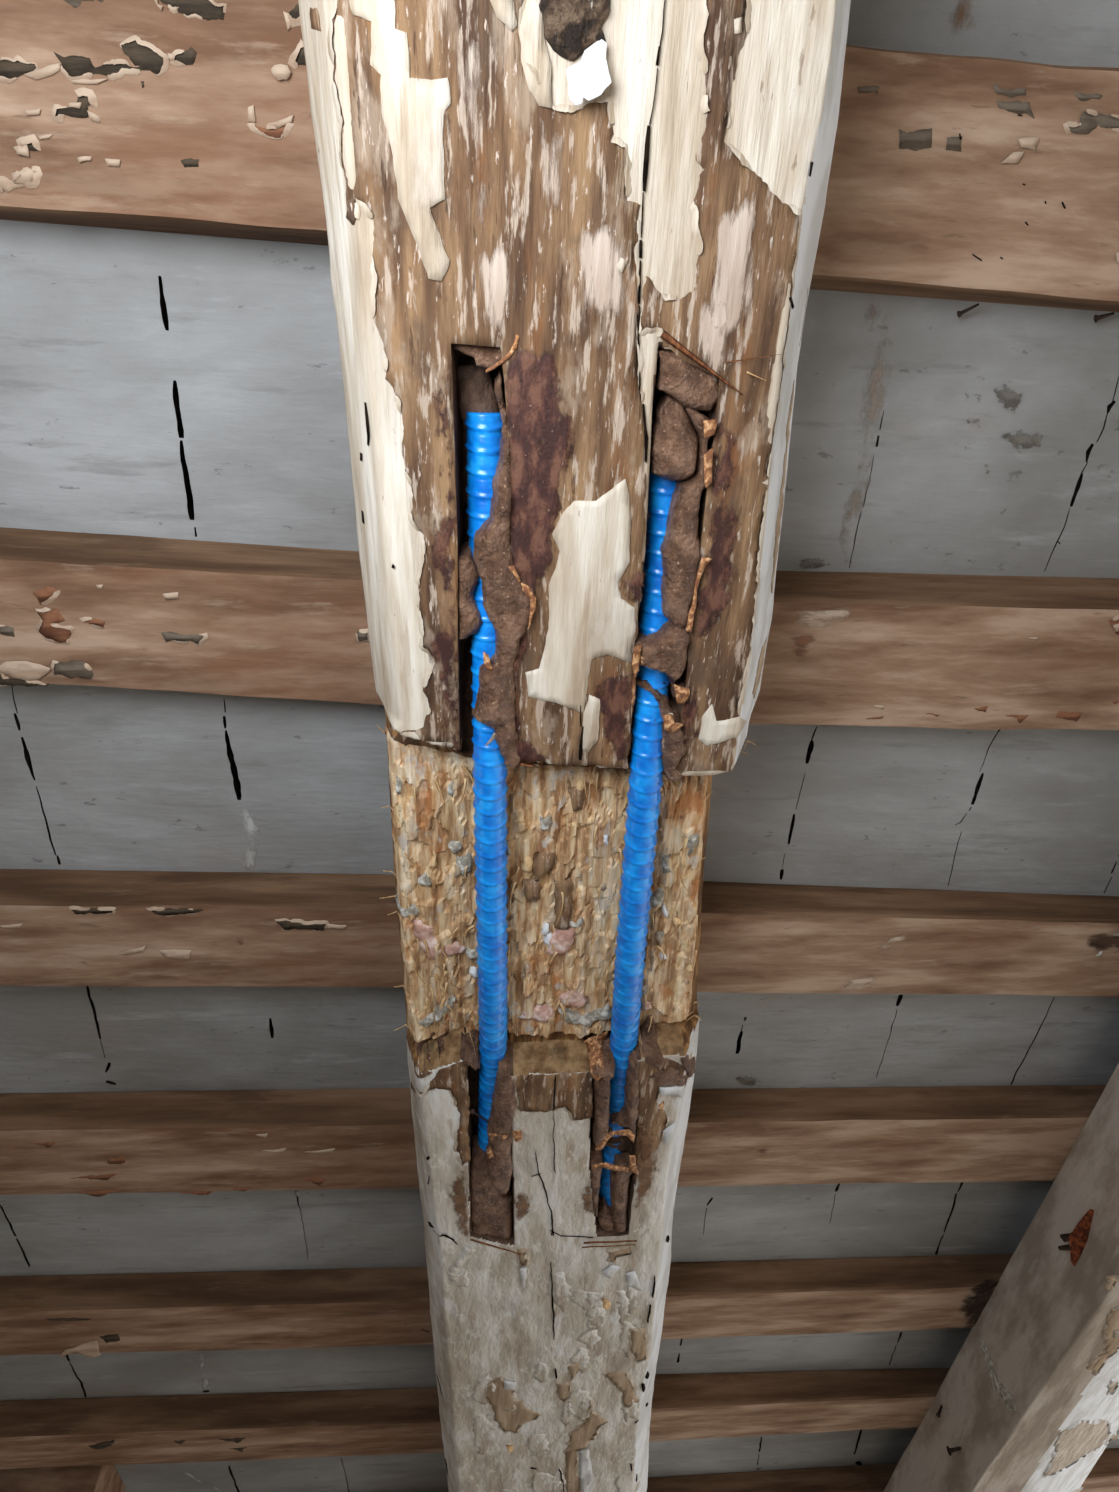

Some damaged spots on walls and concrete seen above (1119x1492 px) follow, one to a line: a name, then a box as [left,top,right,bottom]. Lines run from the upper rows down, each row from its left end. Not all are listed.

peeling [154,0,227,20]
peeling [0,35,199,193]
crack [158,276,169,331]
crack [173,380,197,537]
crack [1044,377,1119,572]
peeling [0,586,105,687]
peeling [274,0,808,1174]
crack [11,686,61,865]
crack [780,727,817,880]
crack [948,730,1000,885]
peeling [471,1245,648,1492]
peeling [1043,1419,1119,1478]